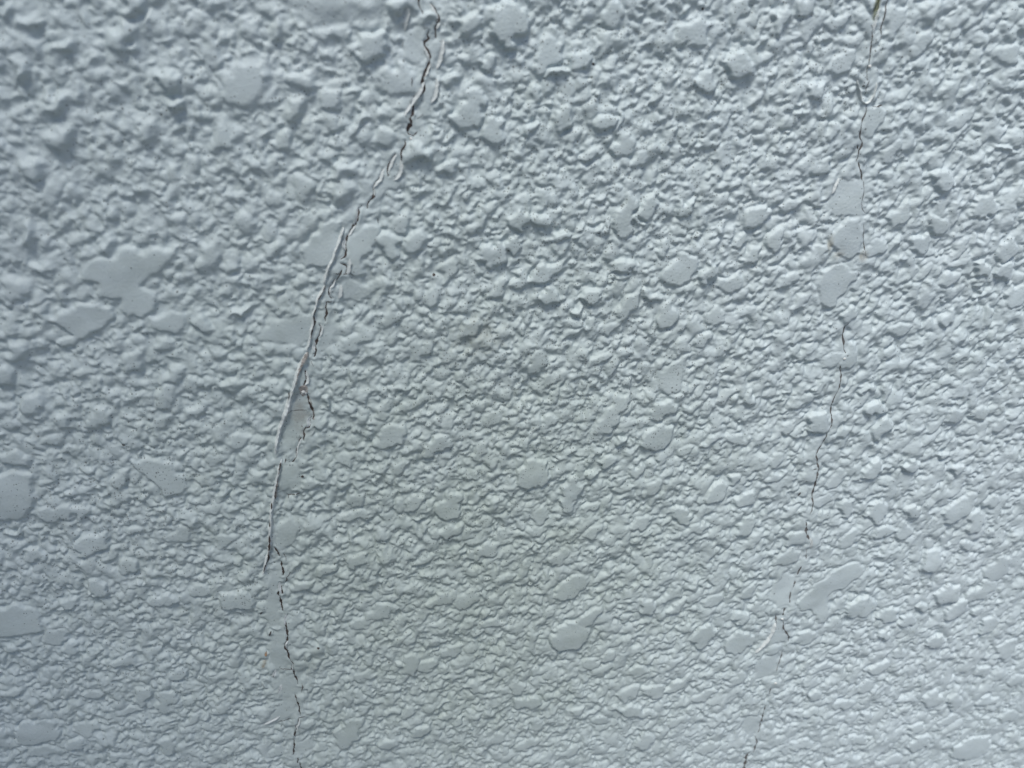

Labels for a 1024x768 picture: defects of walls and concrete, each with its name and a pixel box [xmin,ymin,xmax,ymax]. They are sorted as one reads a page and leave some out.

crack [285,0,445,462]
crack [831,0,888,275]
crack [260,547,305,768]
crack [743,323,849,768]